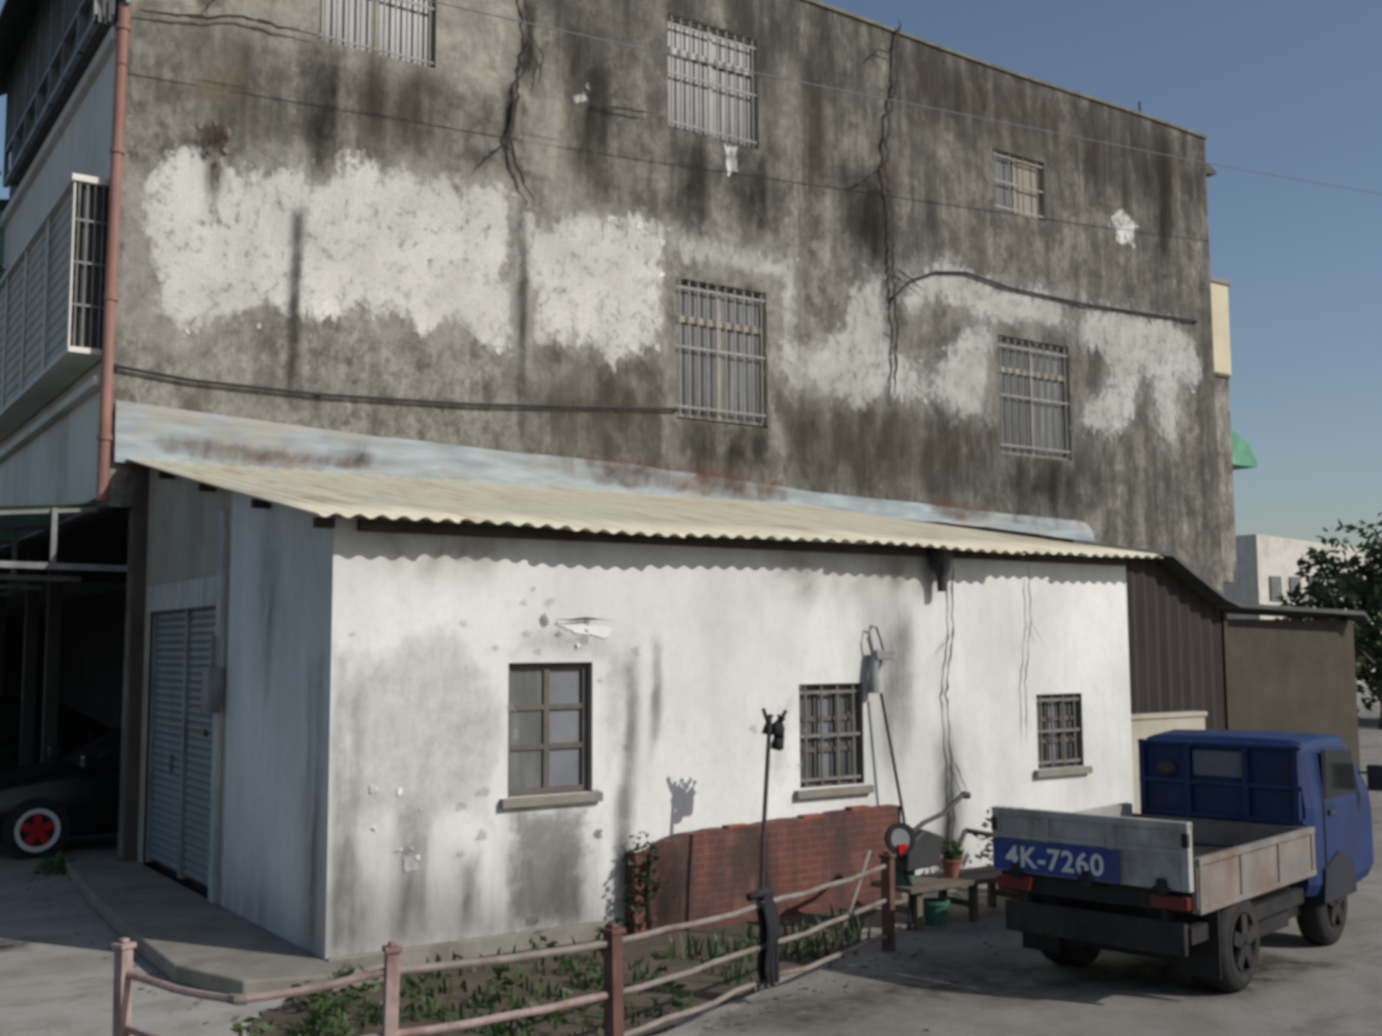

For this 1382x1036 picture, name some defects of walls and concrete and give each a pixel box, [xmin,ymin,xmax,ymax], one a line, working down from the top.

water stain [505,93,515,150]
crack [477,0,544,200]
water stain [572,55,606,165]
water stain [291,217,302,382]
peeling [141,120,1201,442]
peeling [541,612,613,648]
crack [937,567,967,852]